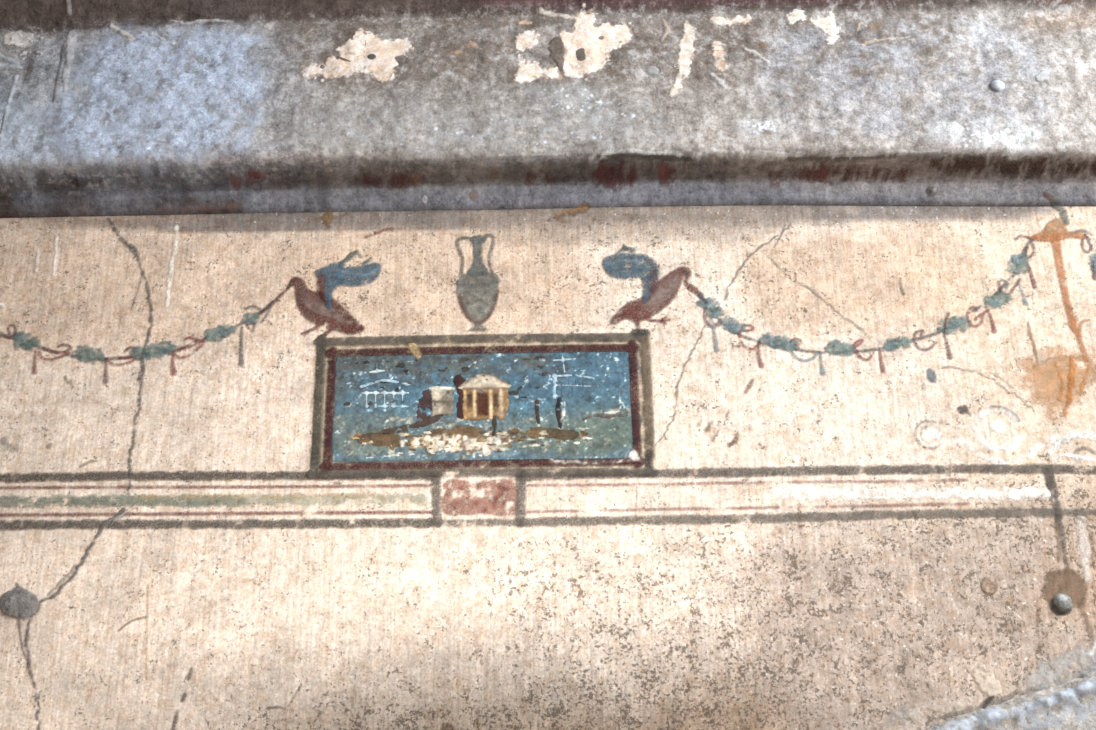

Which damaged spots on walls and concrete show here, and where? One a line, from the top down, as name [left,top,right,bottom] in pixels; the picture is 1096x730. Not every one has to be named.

flaking render [297,28,414,82]
flaking render [515,3,632,83]
crack [18,218,153,730]
flaking render [973,665,1002,697]
flaking render [1027,642,1096,689]